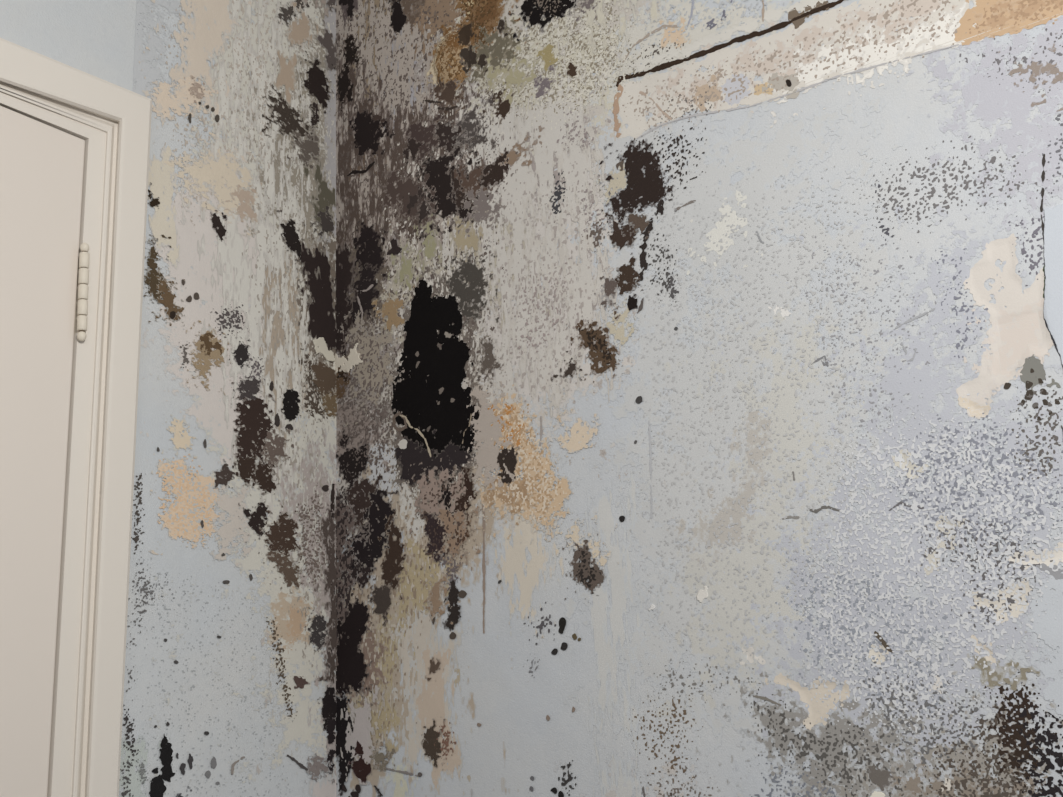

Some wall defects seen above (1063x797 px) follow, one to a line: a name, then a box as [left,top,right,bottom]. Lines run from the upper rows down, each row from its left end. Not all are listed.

leakage [133,0,188,104]
crack [616,0,959,139]
leakage [147,182,160,209]
crack [1039,154,1047,279]
crack [1044,319,1063,367]
leakage [140,431,225,546]
peeling [149,409,261,571]
leakage [126,559,209,732]
leakage [119,705,203,797]
leakage [551,758,577,797]